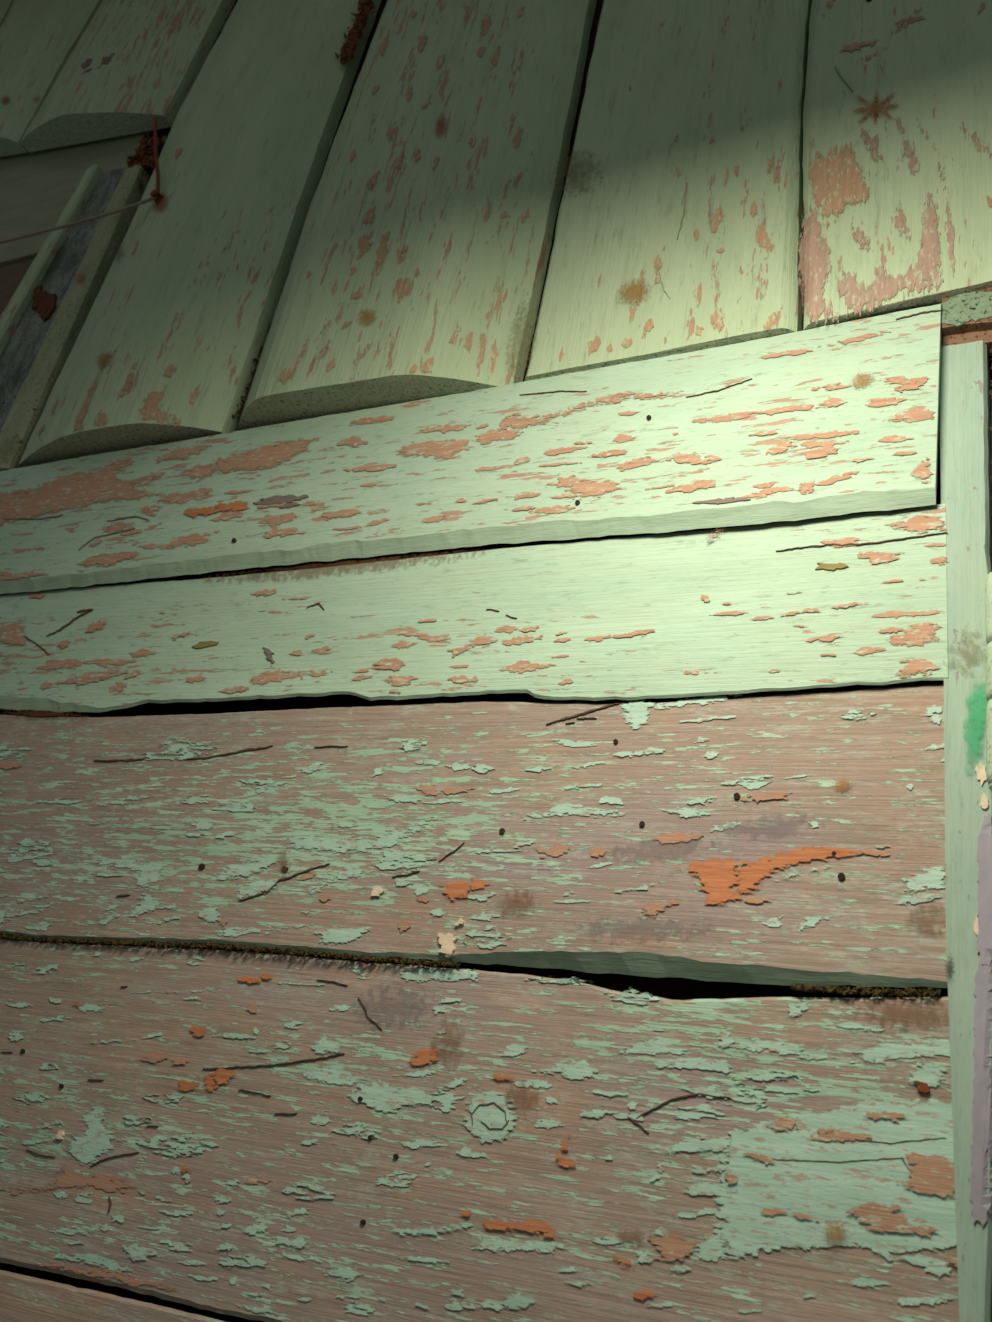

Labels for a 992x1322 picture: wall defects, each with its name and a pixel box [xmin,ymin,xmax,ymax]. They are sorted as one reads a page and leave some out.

peeling [798,117,992,327]
peeling [0,437,390,567]
peeling [336,390,684,486]
peeling [475,433,721,514]
peeling [748,376,934,483]
peeling [352,618,654,693]
peeling [701,595,943,678]
peeling [621,694,742,759]
peeling [397,967,479,982]
peeling [301,1036,644,1158]
peeling [617,1021,958,1276]
peeling [46,1179,385,1317]